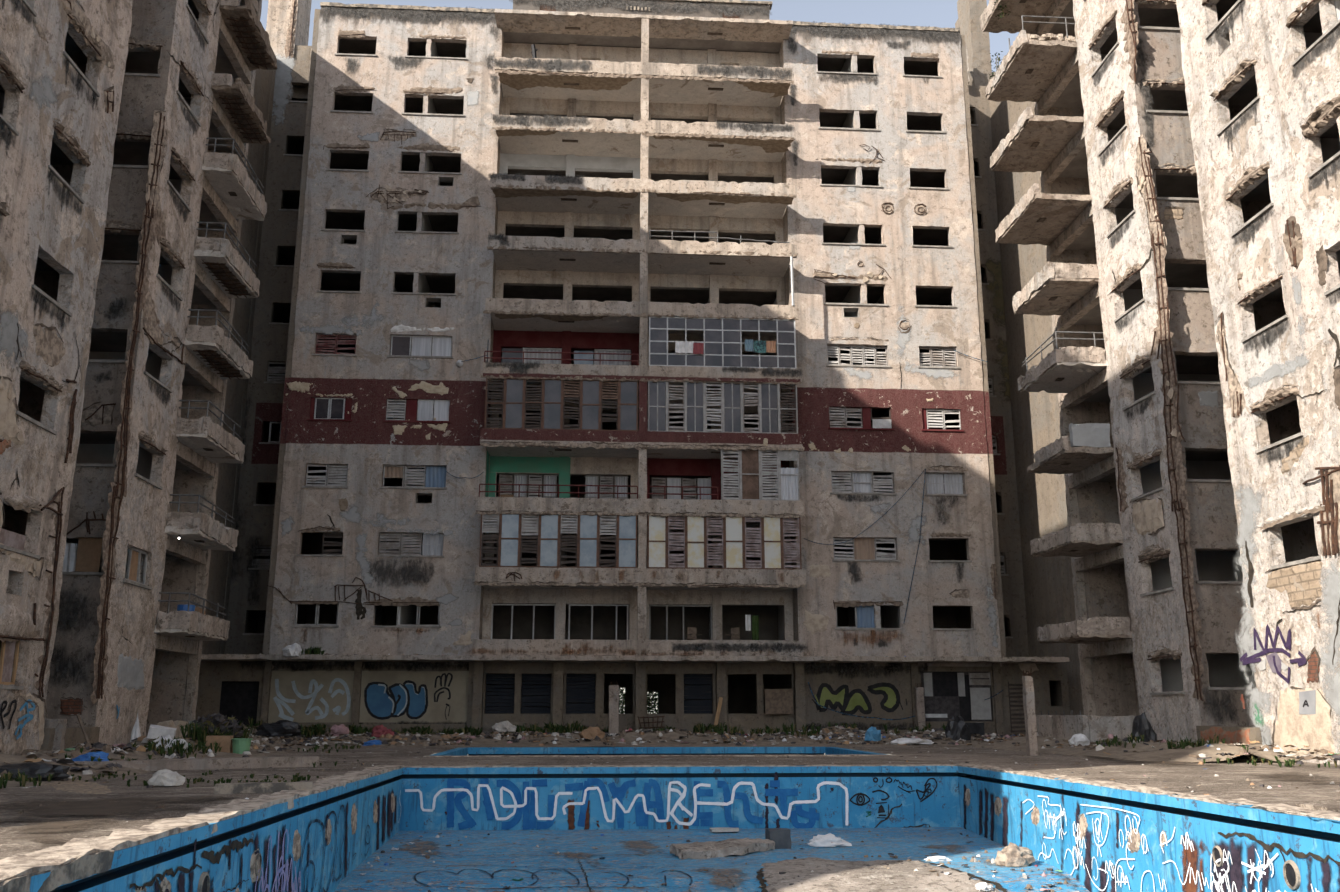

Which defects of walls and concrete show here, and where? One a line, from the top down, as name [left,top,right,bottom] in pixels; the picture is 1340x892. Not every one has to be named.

spalling [61,0,115,70]
spalling [201,0,298,70]
spalling [0,47,26,93]
spalling [179,57,266,143]
spalling [366,184,796,210]
spalling [201,259,252,298]
peeling [384,381,449,398]
spalling [0,110,243,747]
peeling [392,418,447,440]
flaking render [1265,465,1340,610]
leakage [368,559,433,586]
peeling [760,857,1000,892]